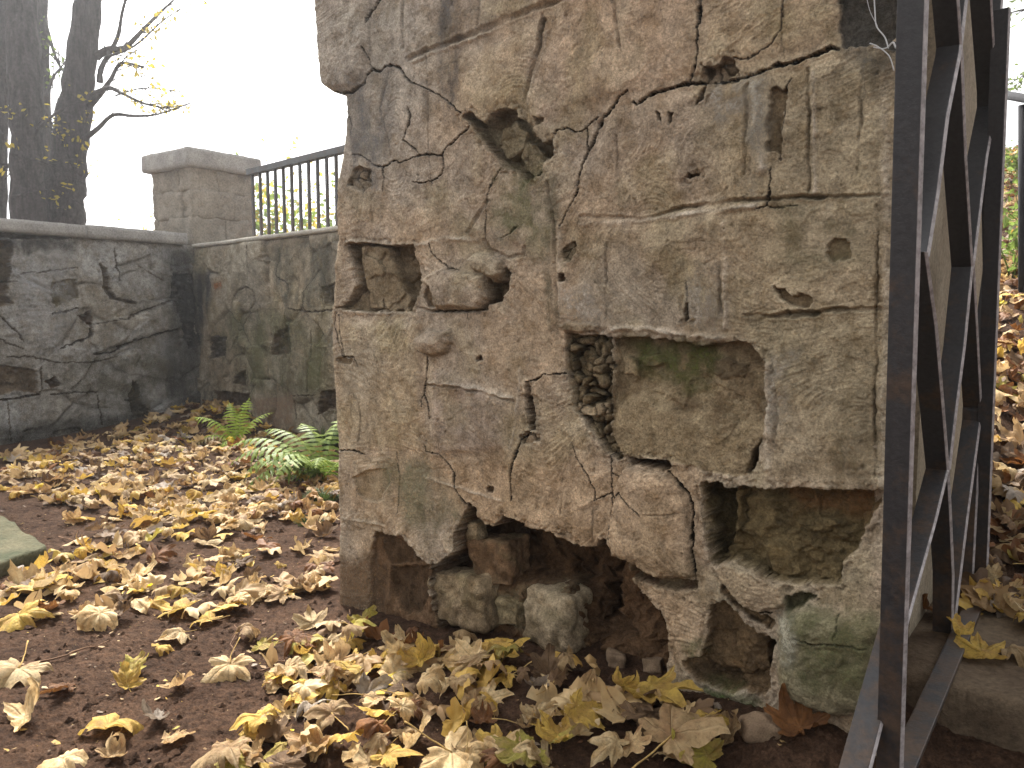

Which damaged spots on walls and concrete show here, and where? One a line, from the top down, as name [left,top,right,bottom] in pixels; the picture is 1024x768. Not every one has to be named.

crack [334,0,470,187]
spalling [464,107,554,179]
crack [553,3,841,226]
spalling [766,85,788,152]
spalling [322,241,435,311]
crack [0,248,181,442]
crack [526,371,569,382]
crack [571,442,640,539]
crack [669,470,697,571]
spalling [566,333,882,612]
spalling [372,508,699,666]
spalling [686,585,777,694]